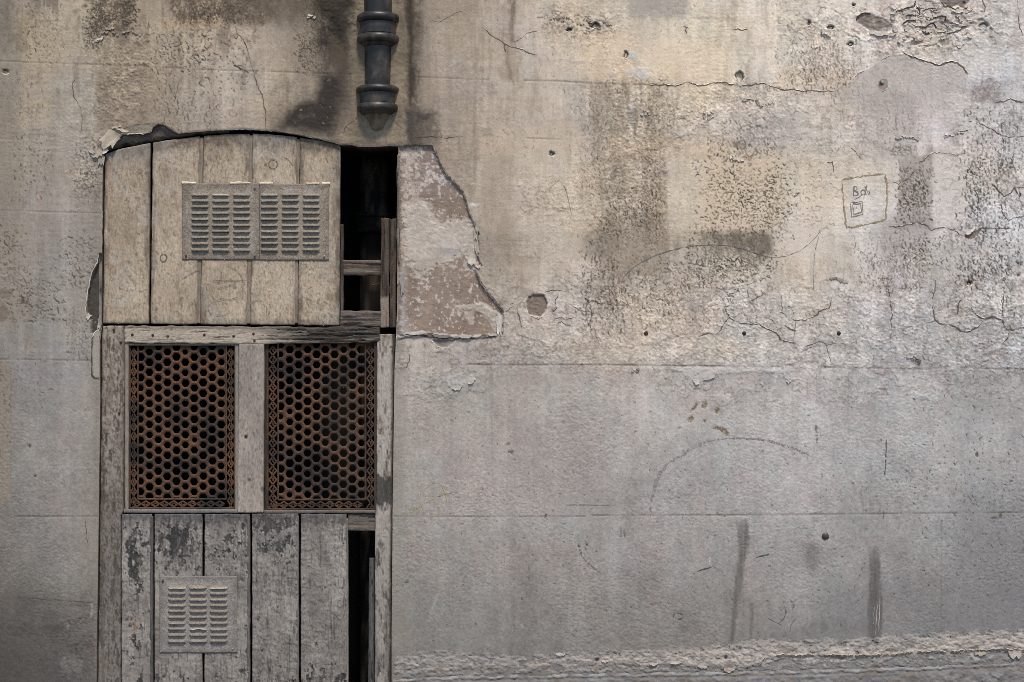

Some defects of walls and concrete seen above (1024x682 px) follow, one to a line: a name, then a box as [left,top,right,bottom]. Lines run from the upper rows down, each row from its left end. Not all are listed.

damp [273,0,363,141]
damp [402,0,436,148]
crack [486,29,536,55]
peeling [88,125,129,165]
crack [886,152,1024,237]
flaking render [397,145,504,348]
flaking render [526,293,548,321]
crack [700,289,835,361]
crack [887,278,1024,343]
damp [727,516,885,650]
flaking render [393,627,1024,678]